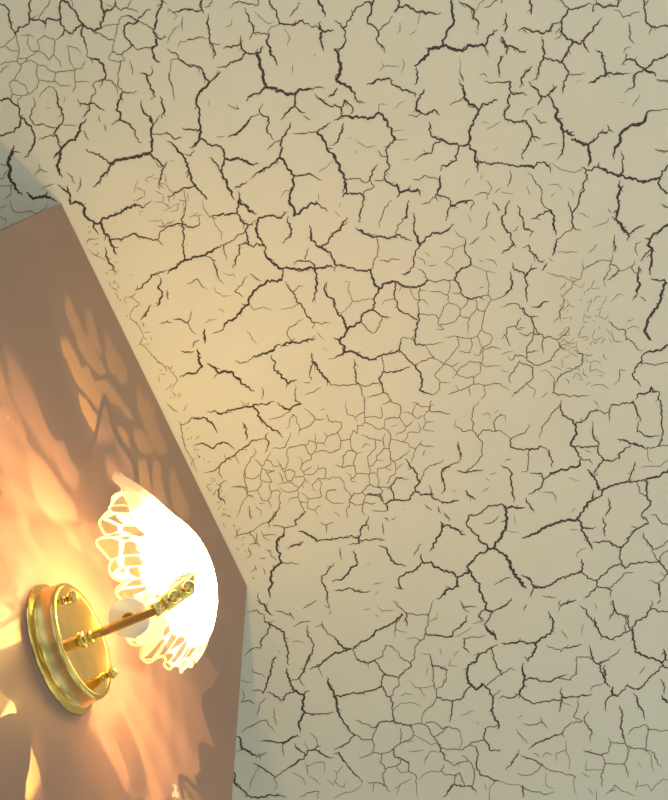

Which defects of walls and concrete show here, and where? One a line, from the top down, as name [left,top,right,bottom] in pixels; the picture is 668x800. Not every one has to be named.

crack [0,0,220,214]
crack [58,0,668,598]
crack [321,564,383,615]
crack [396,386,668,749]
crack [233,595,555,799]
crack [506,750,576,793]
crack [585,706,668,787]